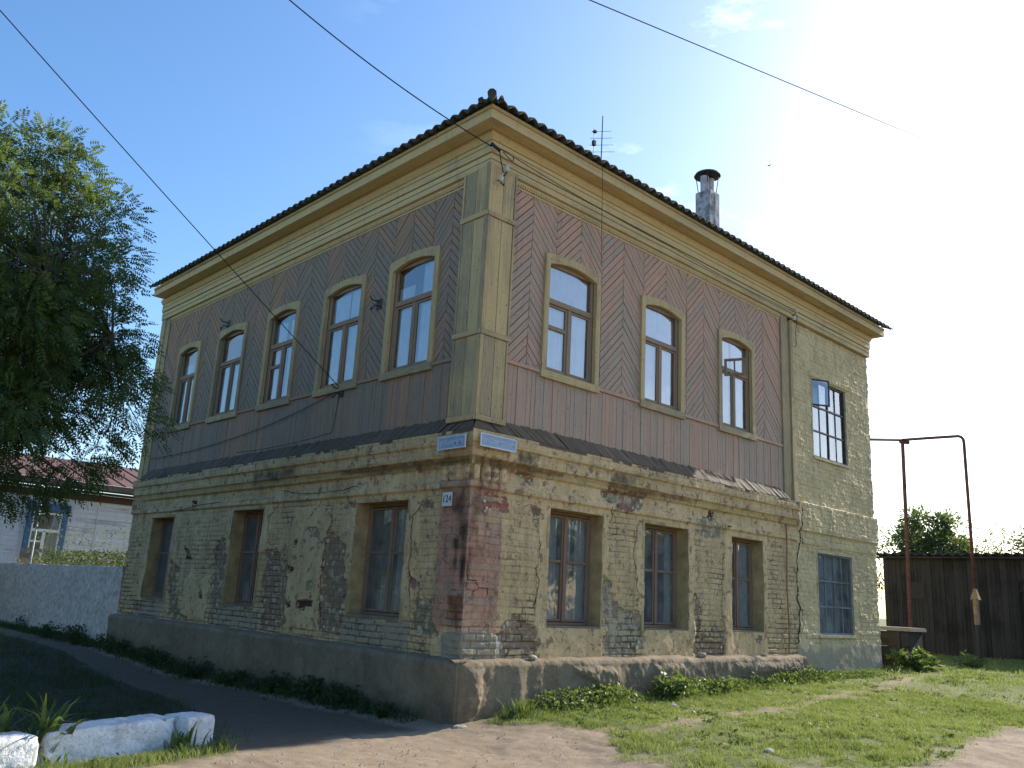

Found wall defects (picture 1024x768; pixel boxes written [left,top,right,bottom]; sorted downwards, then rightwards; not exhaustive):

peeling [481,491,510,516]
spalling [600,488,647,513]
spalling [260,526,348,639]
crack [407,501,424,603]
spalling [496,613,540,658]
spalling [602,578,645,656]
spalling [693,593,726,655]
crack [795,506,803,651]